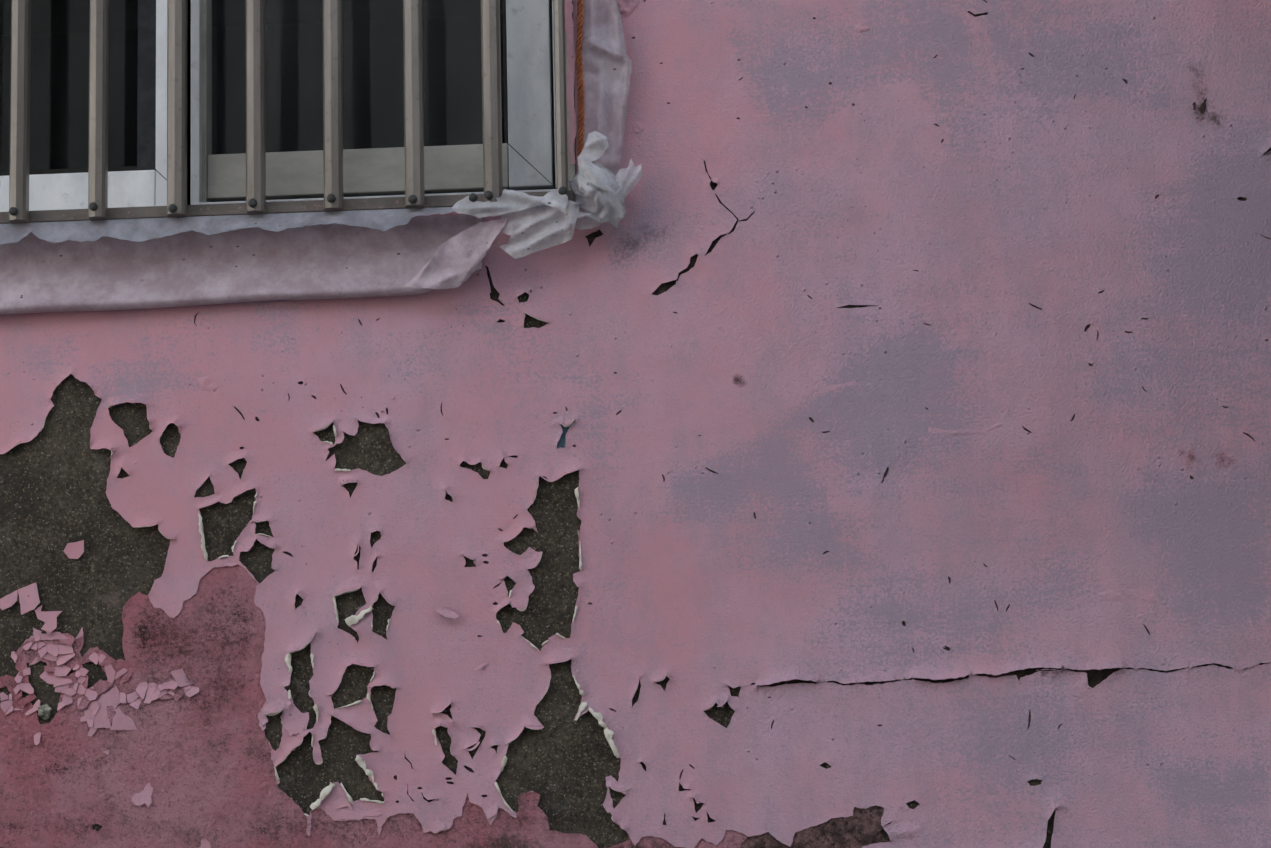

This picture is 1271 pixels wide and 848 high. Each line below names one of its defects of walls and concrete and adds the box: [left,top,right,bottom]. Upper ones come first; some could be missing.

crack [652,161,755,295]
peeling [0,374,748,848]
crack [750,663,1266,688]